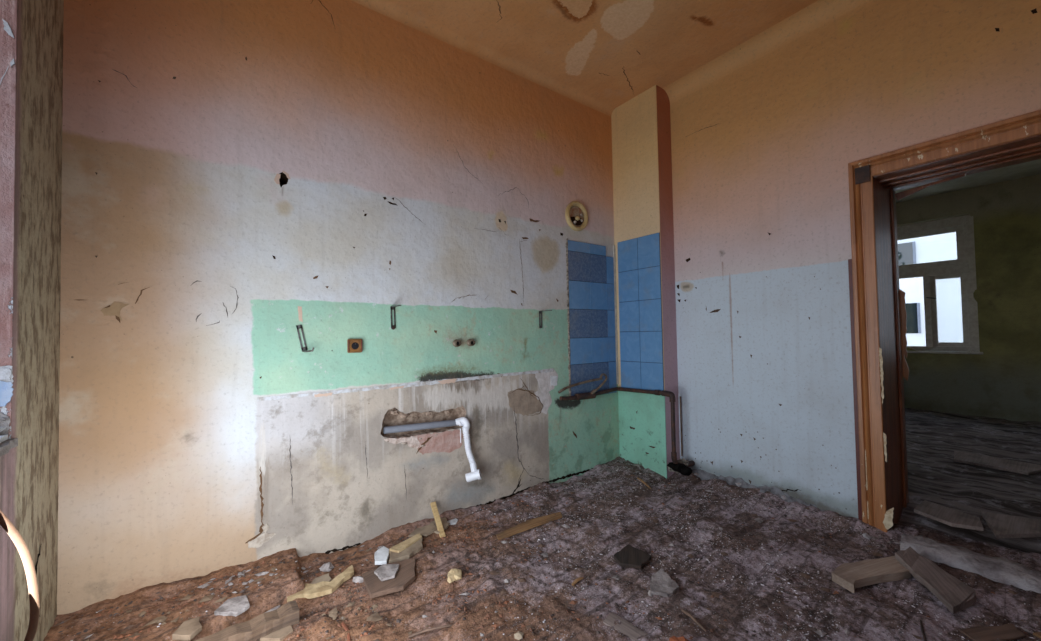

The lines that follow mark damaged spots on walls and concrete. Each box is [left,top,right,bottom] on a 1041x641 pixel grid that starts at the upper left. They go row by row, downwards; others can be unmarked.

water stain [541,0,607,31]
peeling [559,0,663,80]
peeling [0,365,14,436]
crack [246,466,264,543]
crack [287,439,295,504]
flaking render [257,368,558,416]
spalling [381,406,466,455]
crack [476,378,593,506]